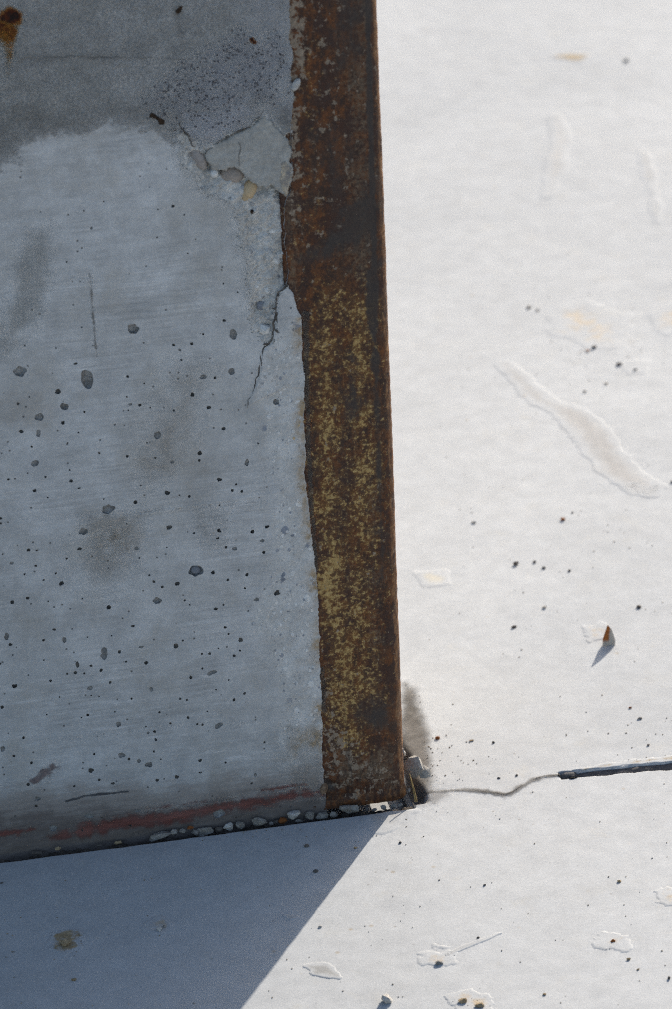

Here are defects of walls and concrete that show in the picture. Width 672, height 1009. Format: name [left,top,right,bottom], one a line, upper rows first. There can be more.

corrosion [0,7,23,58]
peeling [0,0,323,775]
crack [247,284,288,408]
crack [423,774,558,796]